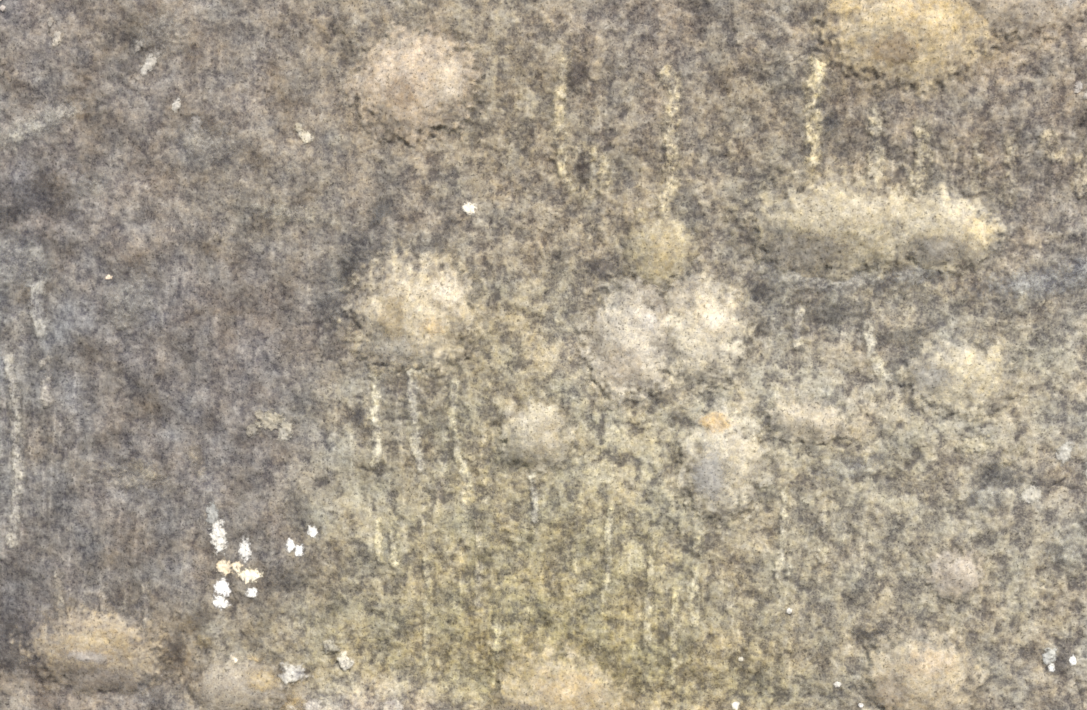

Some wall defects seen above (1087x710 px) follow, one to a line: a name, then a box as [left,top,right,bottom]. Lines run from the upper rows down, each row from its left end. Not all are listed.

peeling [295,123,314,144]
peeling [462,202,477,215]
peeling [246,408,293,440]
peeling [955,433,1027,467]
peeling [1055,441,1075,464]
peeling [1018,485,1042,504]
peeling [286,525,318,556]
peeling [1042,647,1057,672]